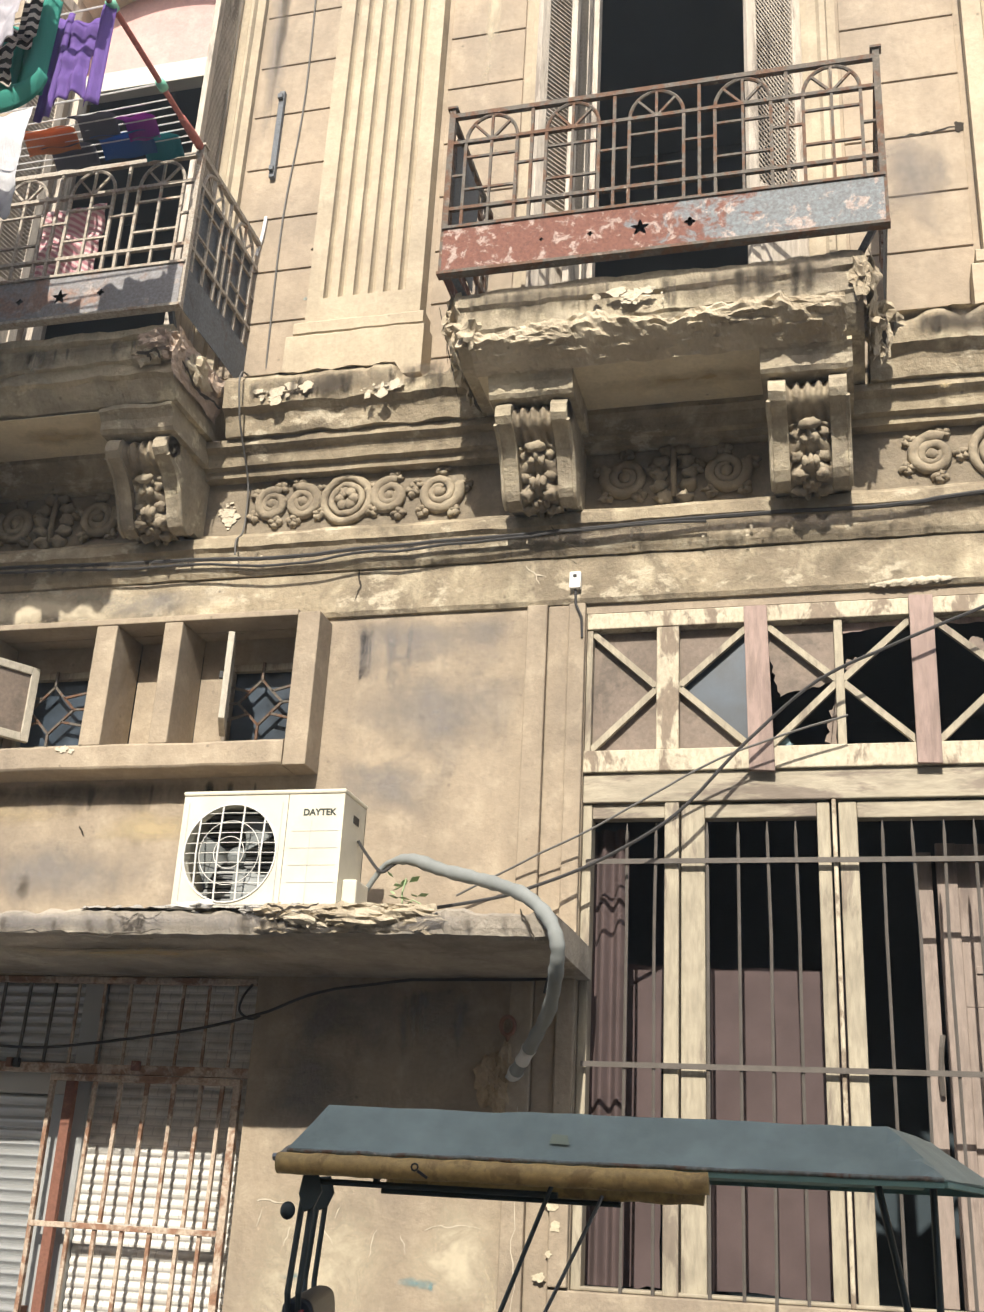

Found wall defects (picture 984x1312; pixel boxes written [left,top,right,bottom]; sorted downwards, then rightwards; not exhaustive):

spalling [441,247,984,419]
spalling [130,325,225,424]
peeling [241,362,404,406]
leakage [537,521,744,540]
leakage [765,510,907,524]
crack [0,912,179,949]
spalling [82,900,448,935]
crack [267,903,319,927]